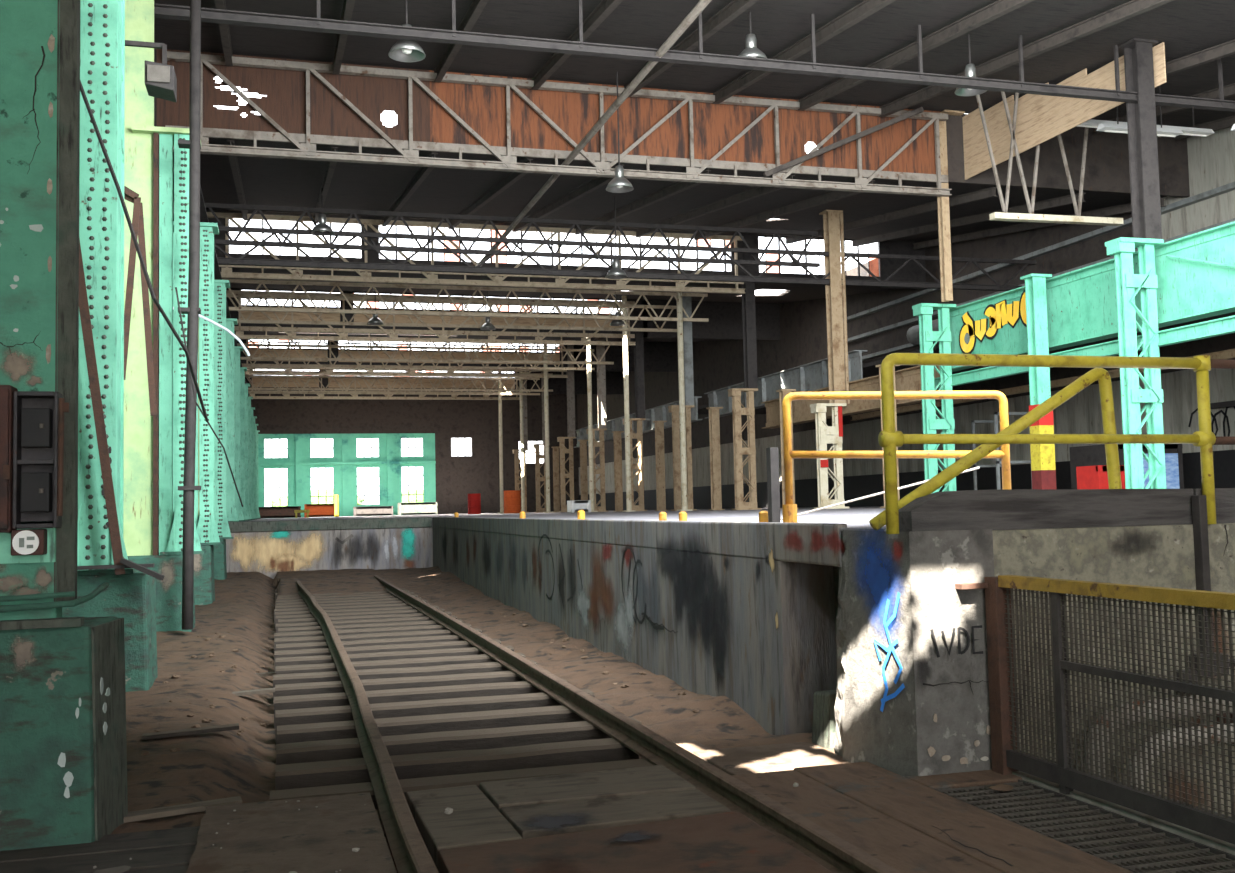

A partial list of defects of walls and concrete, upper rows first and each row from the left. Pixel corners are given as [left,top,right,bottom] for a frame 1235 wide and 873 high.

crack [23,46,45,174]
flaking render [1,344,51,386]
flaking render [12,639,34,669]
peeling [100,677,110,735]
peeling [57,752,74,798]